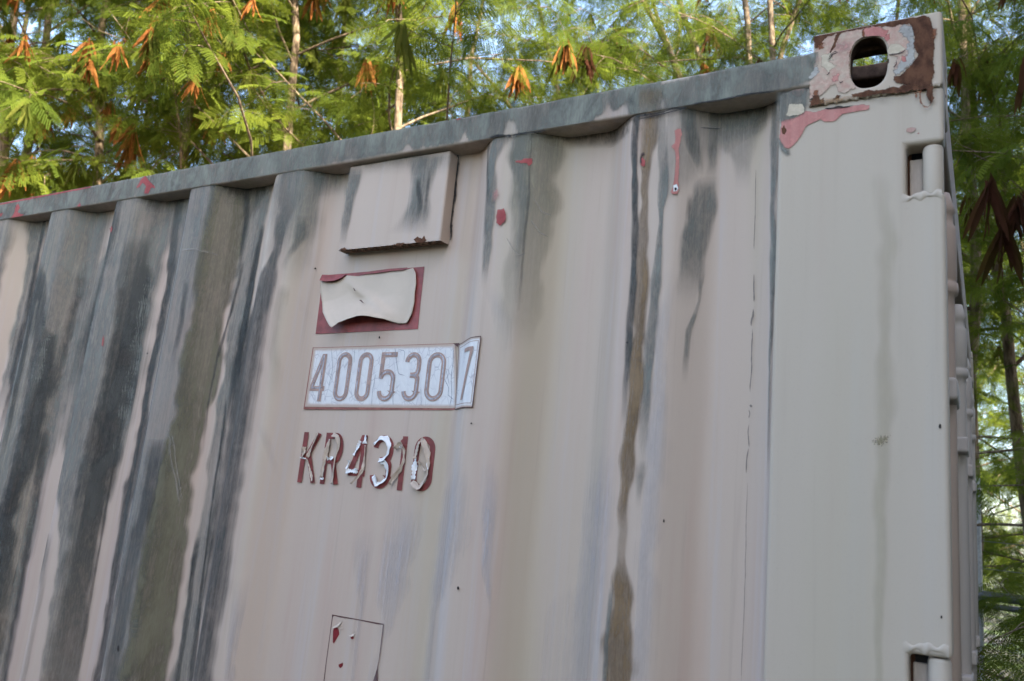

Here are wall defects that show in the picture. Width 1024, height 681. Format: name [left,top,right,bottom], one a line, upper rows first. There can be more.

peeling [779,24,915,149]
damp [0,52,817,681]
crack [746,280,755,470]